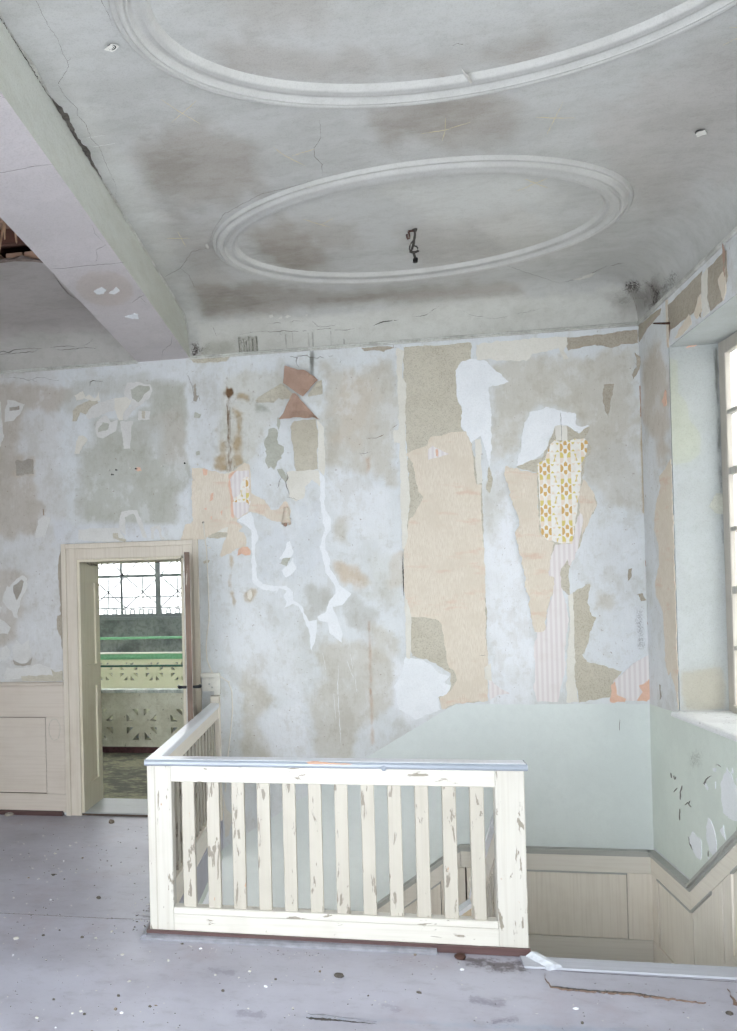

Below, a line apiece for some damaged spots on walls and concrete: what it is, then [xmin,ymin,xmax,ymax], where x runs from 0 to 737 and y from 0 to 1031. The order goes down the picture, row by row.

crack [0,1,116,194]
flaking render [566,250,728,350]
flaking render [0,400,25,446]
flaking render [95,382,153,449]
flaking render [362,342,508,545]
flaking render [602,384,614,415]
flaking render [238,470,351,650]
flaking render [517,407,622,702]
flaking render [0,575,53,681]
flaking render [394,617,480,720]
peeling [689,768,737,860]
crack [545,978,706,1004]